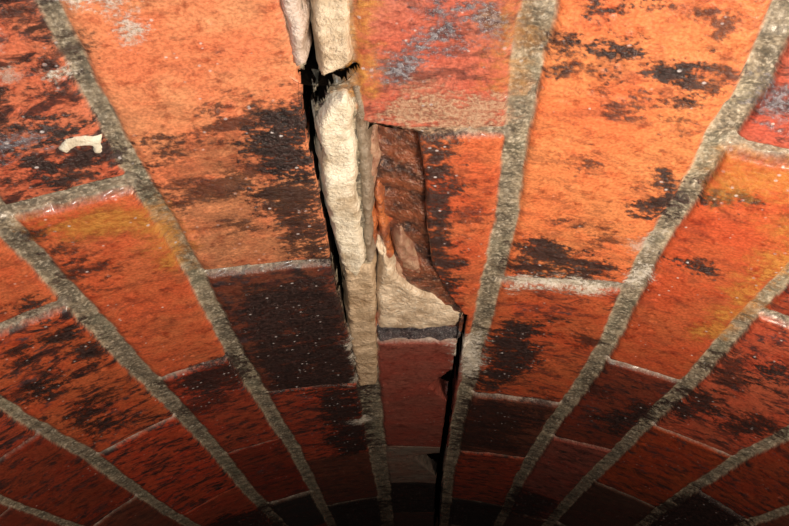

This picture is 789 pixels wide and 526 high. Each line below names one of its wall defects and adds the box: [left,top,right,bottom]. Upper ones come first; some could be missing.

crack [292,24,360,326]
spalling [368,122,465,341]
crack [427,312,468,526]